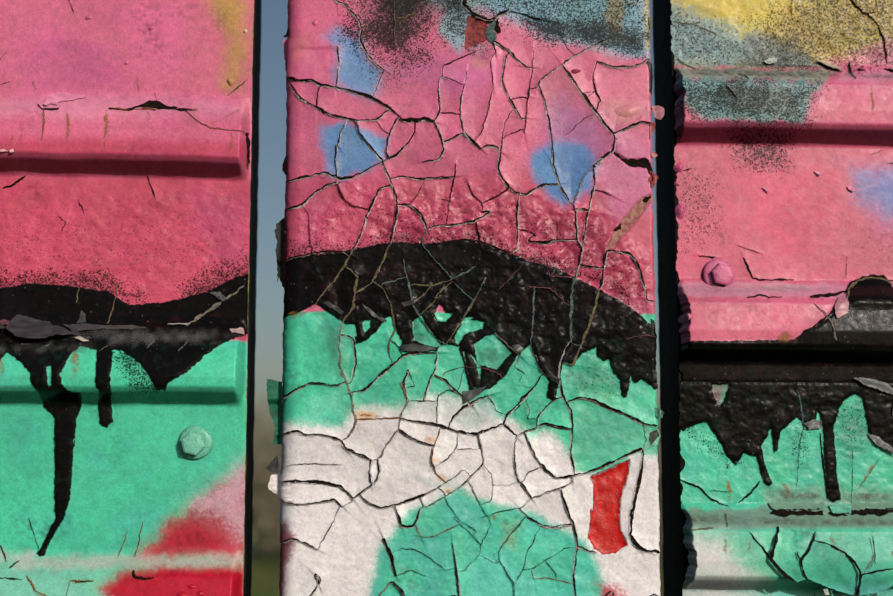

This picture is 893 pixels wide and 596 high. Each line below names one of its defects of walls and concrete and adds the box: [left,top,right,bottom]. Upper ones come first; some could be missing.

crack [817,0,893,79]
crack [109,95,244,132]
peeling [649,105,664,139]
peeling [606,152,658,253]
crack [276,0,660,596]
peeling [0,310,147,342]
peeling [853,377,893,395]
peeling [804,419,822,430]
peeling [866,433,893,454]
crack [751,390,893,557]
crack [680,479,760,531]